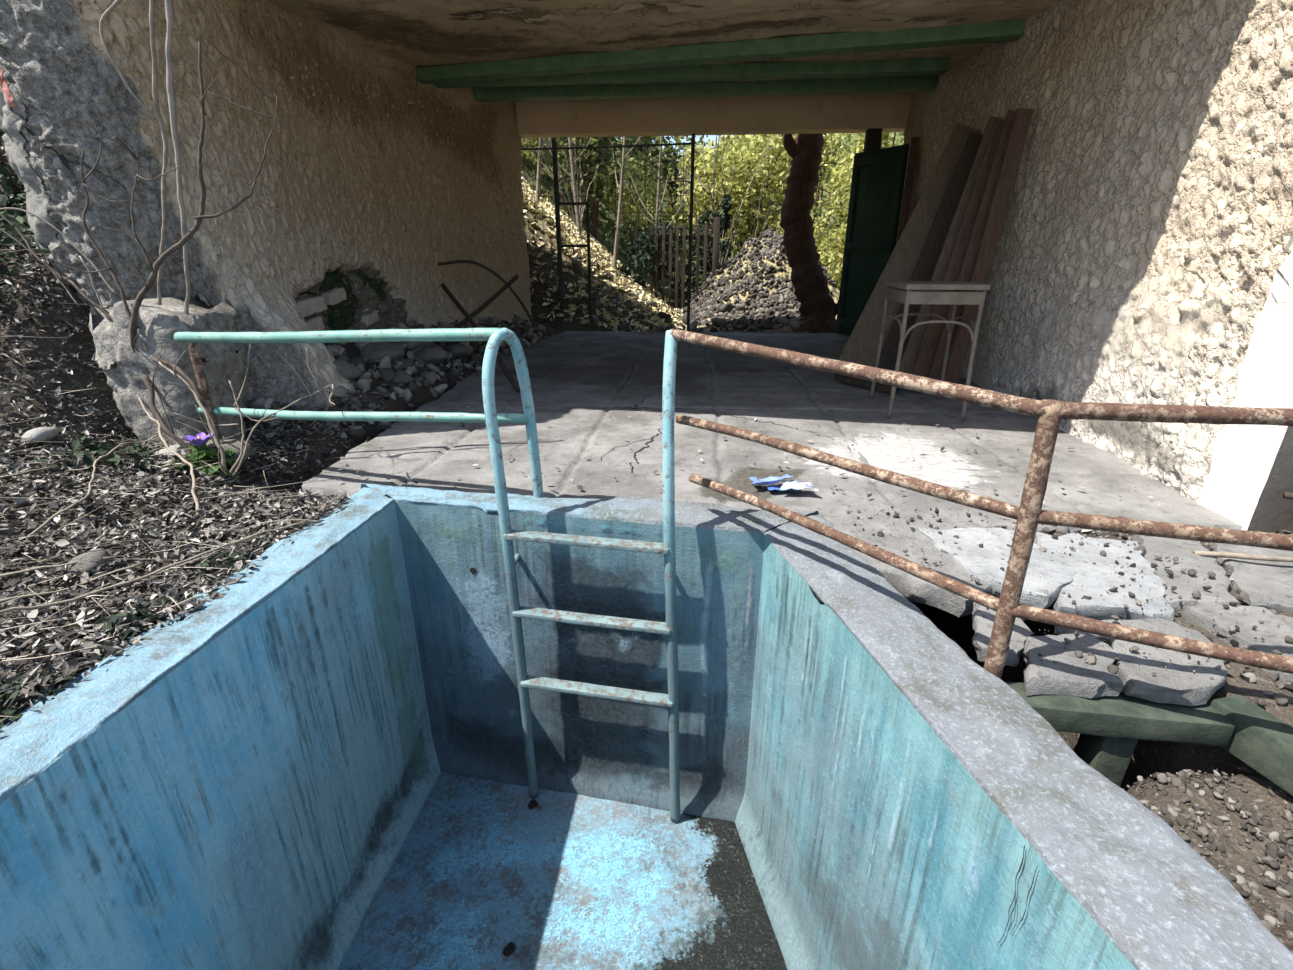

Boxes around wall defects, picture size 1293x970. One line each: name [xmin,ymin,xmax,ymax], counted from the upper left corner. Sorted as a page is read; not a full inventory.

peeling [446,8,577,25]
crack [519,381,831,473]
water stain [448,551,724,797]
water stain [300,732,426,970]
water stain [631,813,787,970]
crack [997,846,1038,949]